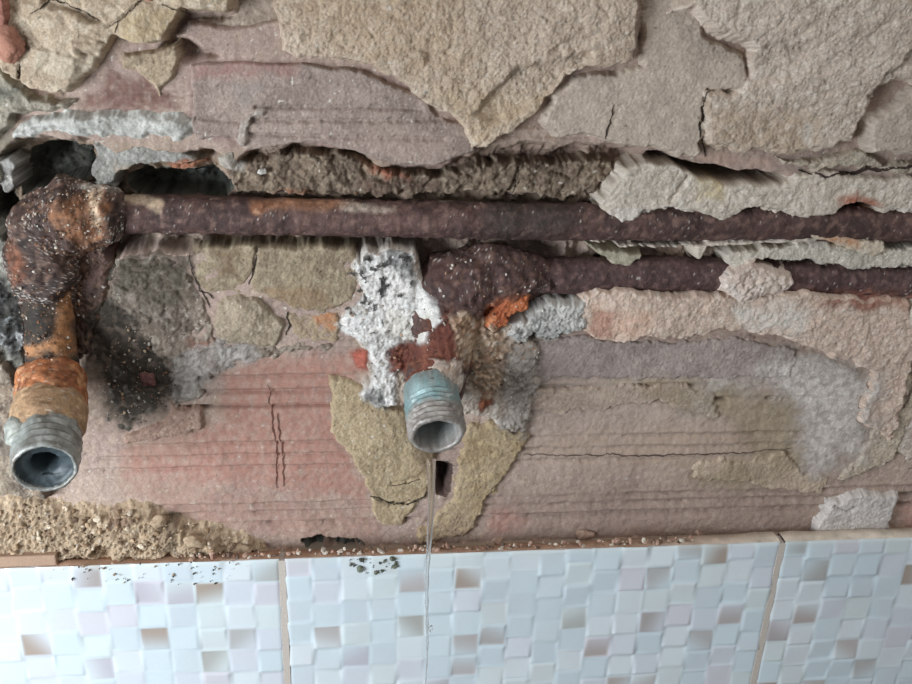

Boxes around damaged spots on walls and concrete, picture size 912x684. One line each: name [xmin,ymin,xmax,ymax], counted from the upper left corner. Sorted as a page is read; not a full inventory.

crack [31,0,188,40]
spalling [0,139,96,218]
spalling [128,164,234,196]
rust [170,157,209,169]
rust [73,239,122,359]
rust [484,294,531,333]
water stain [83,301,260,424]
rust [387,322,464,383]
rust [479,386,493,412]
spalling [435,461,454,497]
peeling [691,450,899,531]
spalling [301,534,324,548]